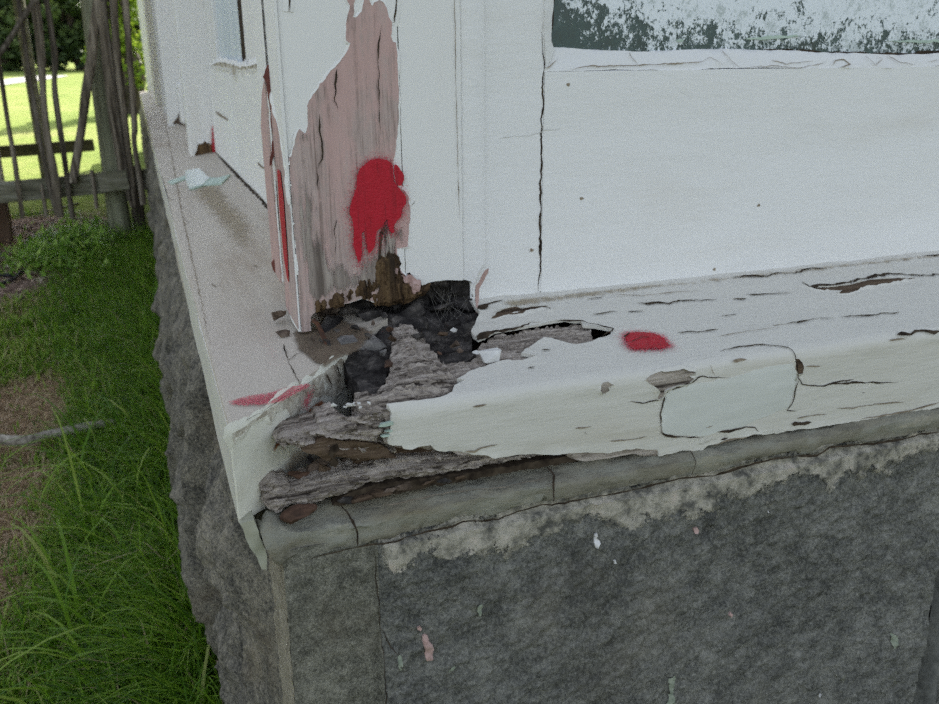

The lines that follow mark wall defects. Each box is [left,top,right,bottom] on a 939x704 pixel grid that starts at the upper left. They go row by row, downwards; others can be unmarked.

crack [261,0,295,67]
peeling [212,0,421,332]
crack [317,70,338,190]
crack [377,0,402,131]
crack [453,0,461,220]
crack [503,0,939,291]
peeling [223,355,348,451]
peeling [491,305,555,319]
peeling [644,365,698,402]
peeling [793,357,805,376]
peeling [797,277,916,295]
crack [295,254,939,704]